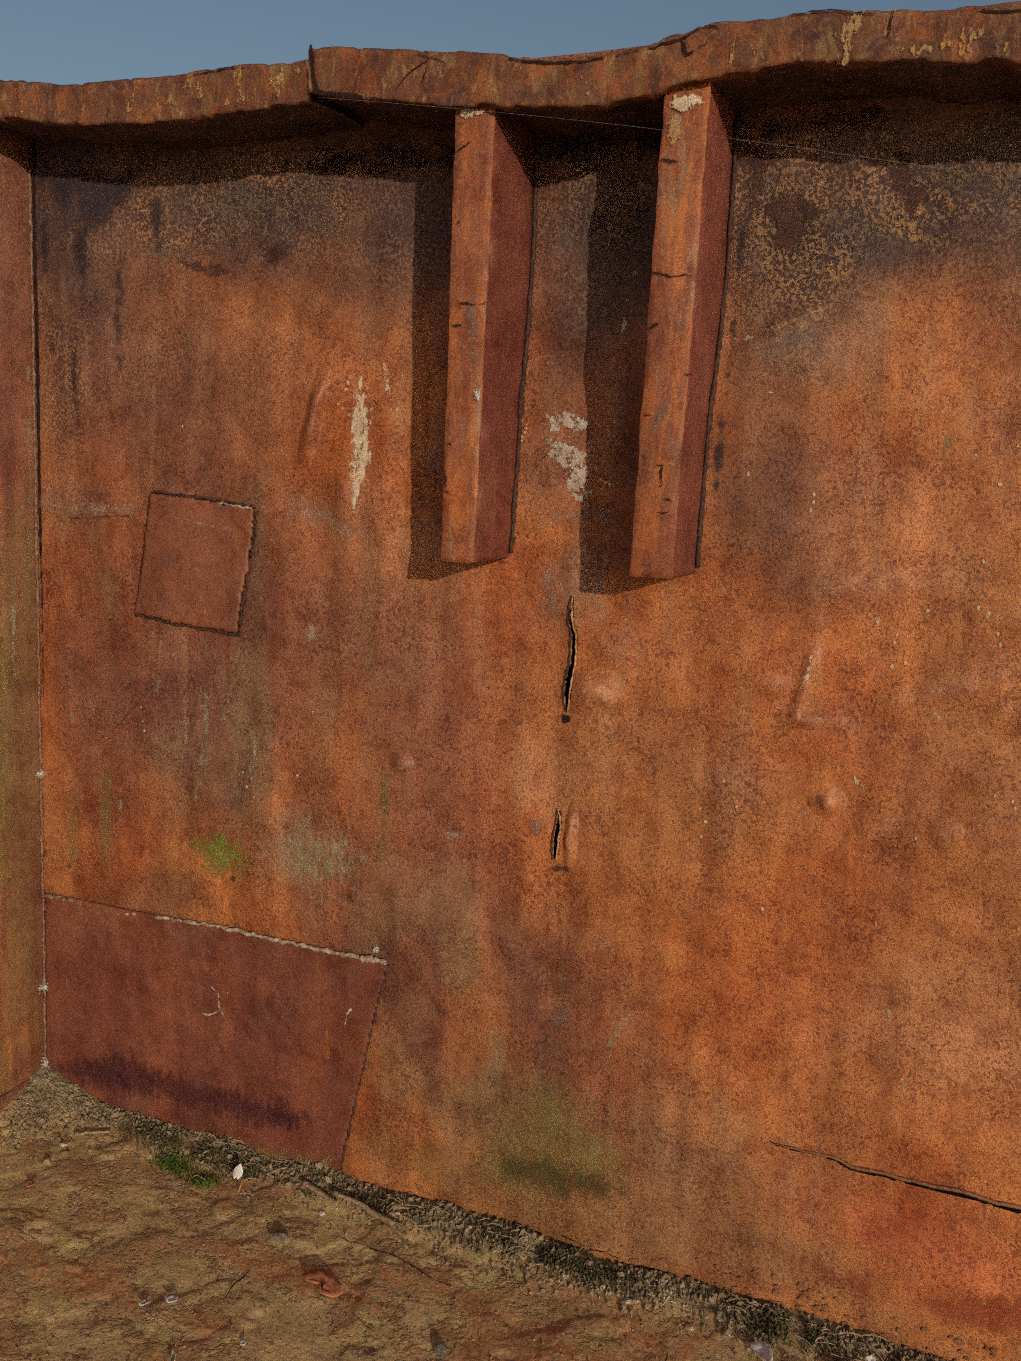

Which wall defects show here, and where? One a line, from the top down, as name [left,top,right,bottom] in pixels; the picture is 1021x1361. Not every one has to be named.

peeling [337,363,391,538]
peeling [546,410,611,503]
crack [560,596,577,742]
leakage [190,833,249,877]
crack [550,808,568,872]
leakage [62,1056,309,1130]
crack [769,1140,1021,1214]